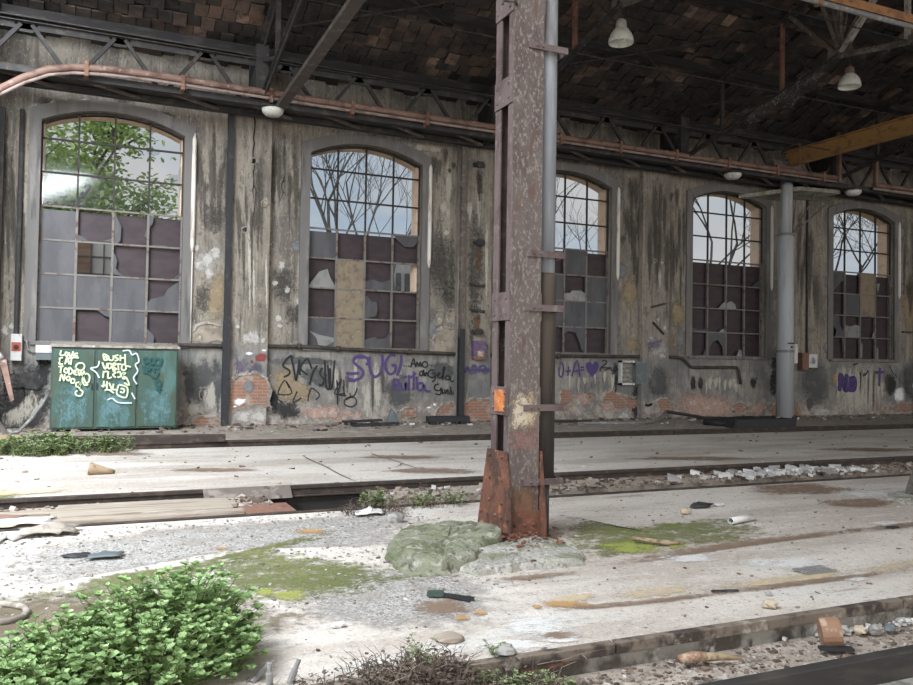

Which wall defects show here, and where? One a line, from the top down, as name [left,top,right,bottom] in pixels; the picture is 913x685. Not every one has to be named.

leakage [195,124,301,327]
crack [250,118,258,229]
leakage [415,143,456,312]
leakage [466,167,489,340]
leakage [621,180,686,347]
leakage [183,360,221,416]
flaking render [188,369,272,426]
flaking render [594,388,675,414]